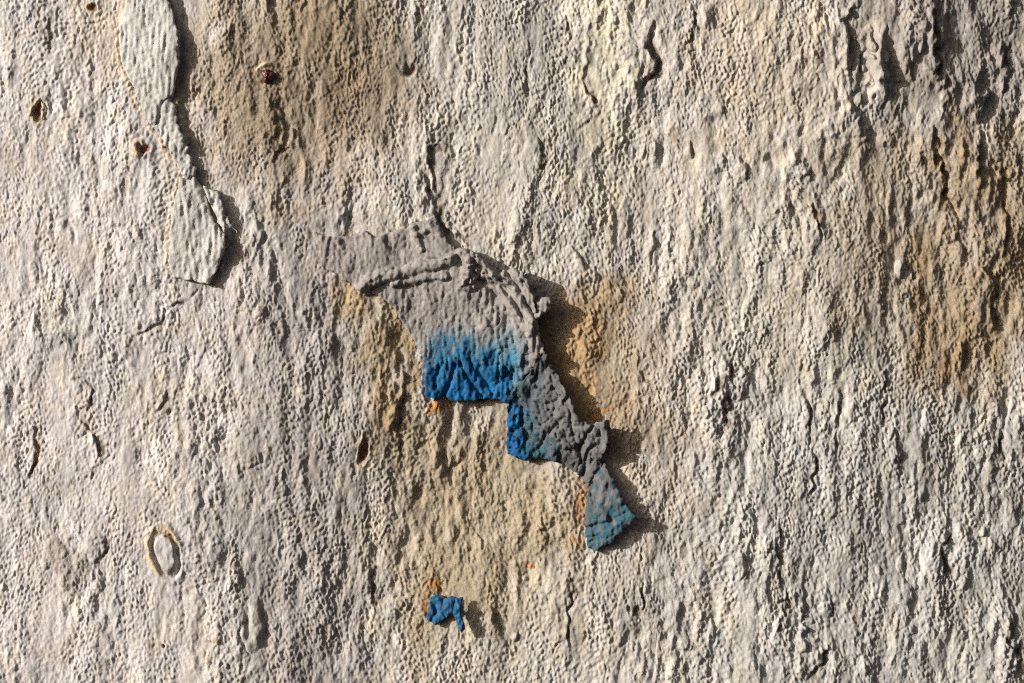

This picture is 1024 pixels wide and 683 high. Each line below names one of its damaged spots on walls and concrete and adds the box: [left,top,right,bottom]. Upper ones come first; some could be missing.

peeling [426,595,465,633]